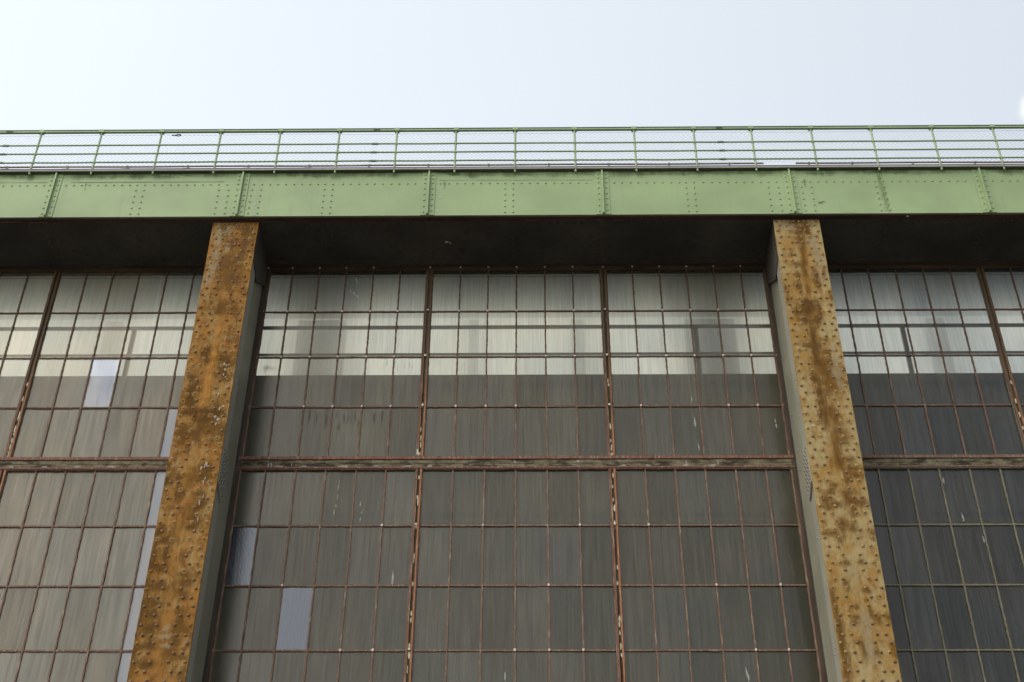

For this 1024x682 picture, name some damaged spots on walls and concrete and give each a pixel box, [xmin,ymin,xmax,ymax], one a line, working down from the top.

rust [180,326,231,437]
rust [787,297,847,422]
rust [127,527,170,680]